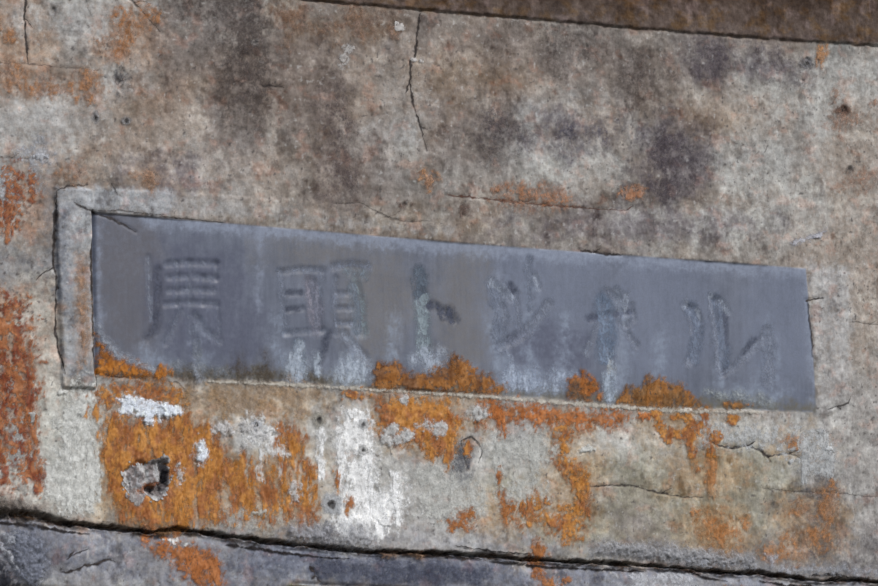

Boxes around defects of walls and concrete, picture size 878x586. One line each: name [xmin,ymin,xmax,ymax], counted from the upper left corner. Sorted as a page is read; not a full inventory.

crack [406,13,428,149]
crack [36,183,222,387]
corrosion [0,287,48,499]
spalling [121,454,184,505]
corrosion [75,267,321,586]
peeling [210,418,269,451]
leakage [205,505,295,535]
peeling [289,480,303,502]
leakage [316,407,560,547]
crack [0,507,878,586]
leakage [173,340,840,504]
corrosion [342,353,754,559]